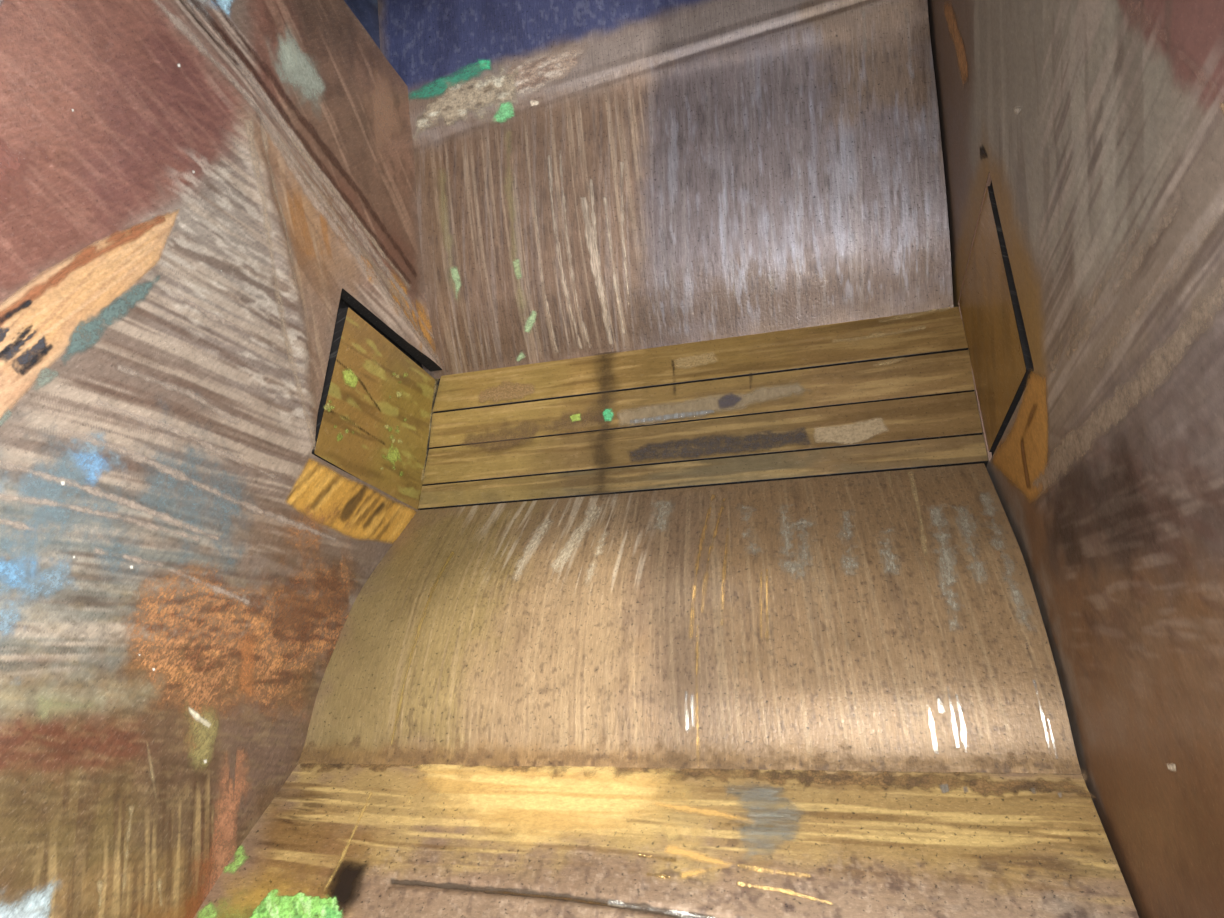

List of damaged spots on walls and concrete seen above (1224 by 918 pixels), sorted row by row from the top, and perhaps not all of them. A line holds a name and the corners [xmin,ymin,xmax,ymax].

rust [131,460,416,718]
leakage [737,864,828,903]